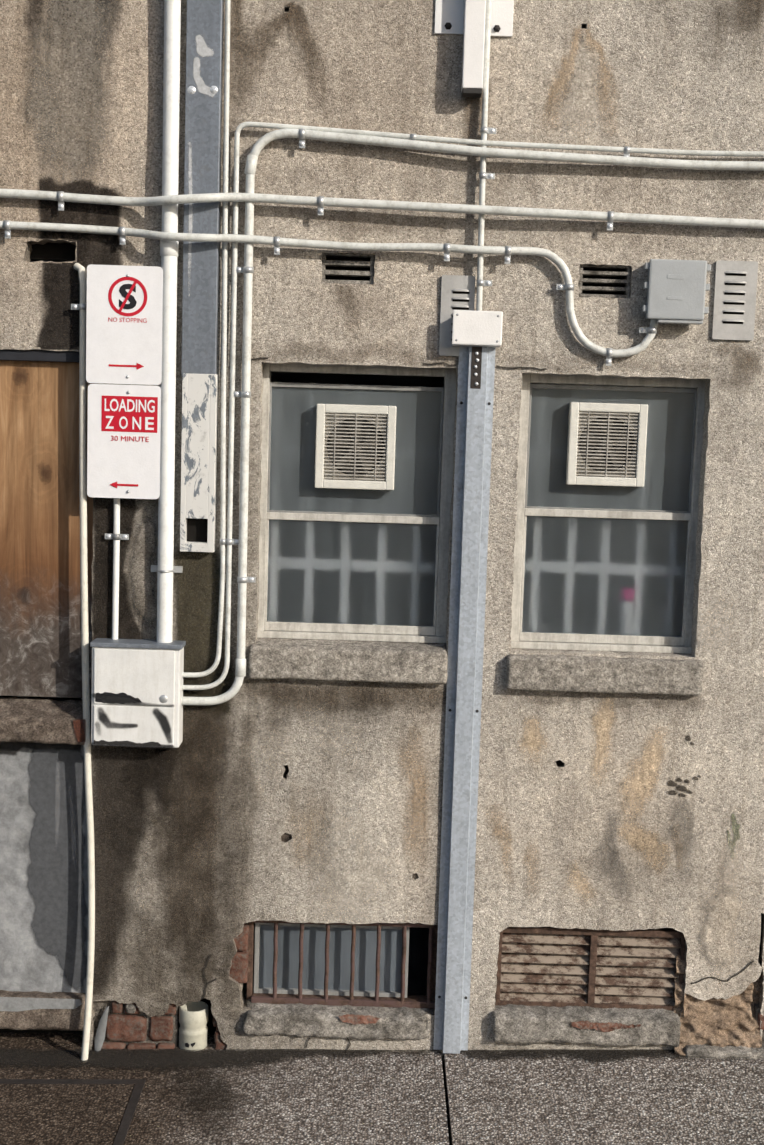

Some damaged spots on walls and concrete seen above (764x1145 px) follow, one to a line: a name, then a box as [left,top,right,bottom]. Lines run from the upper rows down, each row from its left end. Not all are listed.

water stain [230,0,317,78]
water stain [26,0,121,350]
water stain [93,547,446,995]
peeling [0,742,180,1050]
water stain [601,818,624,883]
spalling [200,998,227,1050]
spalling [673,956,764,1059]
crack [690,960,754,984]